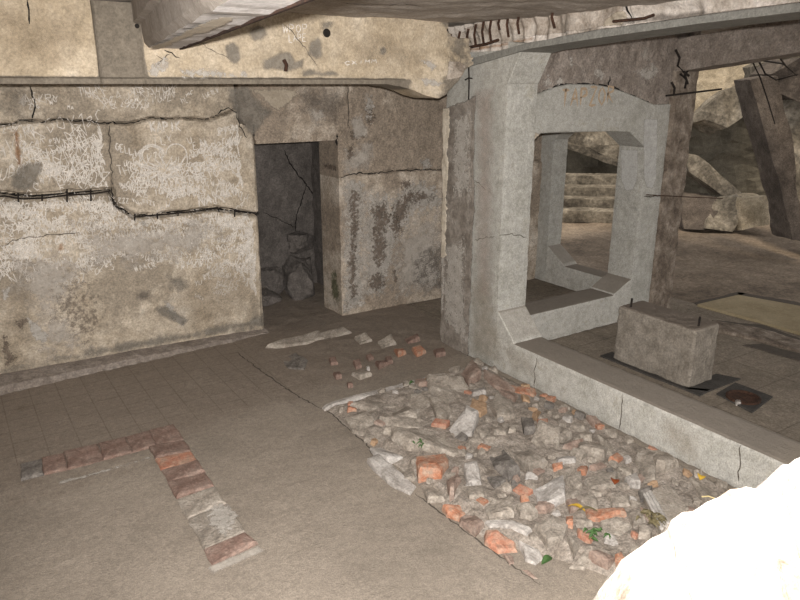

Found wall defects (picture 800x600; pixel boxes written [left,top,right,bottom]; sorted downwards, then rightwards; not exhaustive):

spalling [451,6,701,49]
crack [0,87,313,231]
crack [341,169,441,178]
leakage [393,215,441,292]